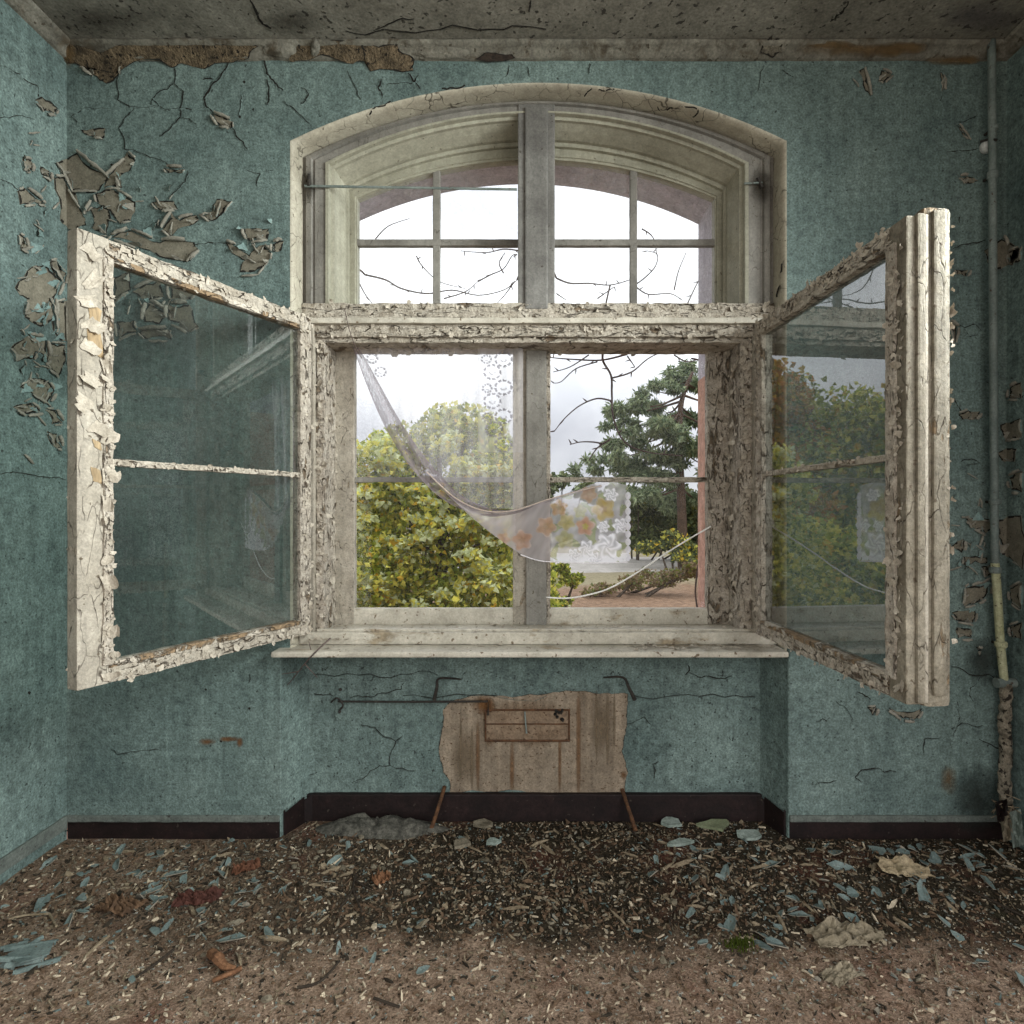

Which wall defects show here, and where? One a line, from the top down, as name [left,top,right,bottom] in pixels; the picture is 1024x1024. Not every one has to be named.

flaking render [67,38,258,84]
flaking render [289,40,415,72]
crack [70,60,310,196]
crack [347,71,465,115]
crack [657,106,699,118]
peeling [949,225,972,356]
peeling [10,132,345,682]
peeling [684,227,924,723]
crack [313,671,546,701]
crack [627,664,756,725]
crack [351,724,415,783]
flaking render [439,691,628,792]